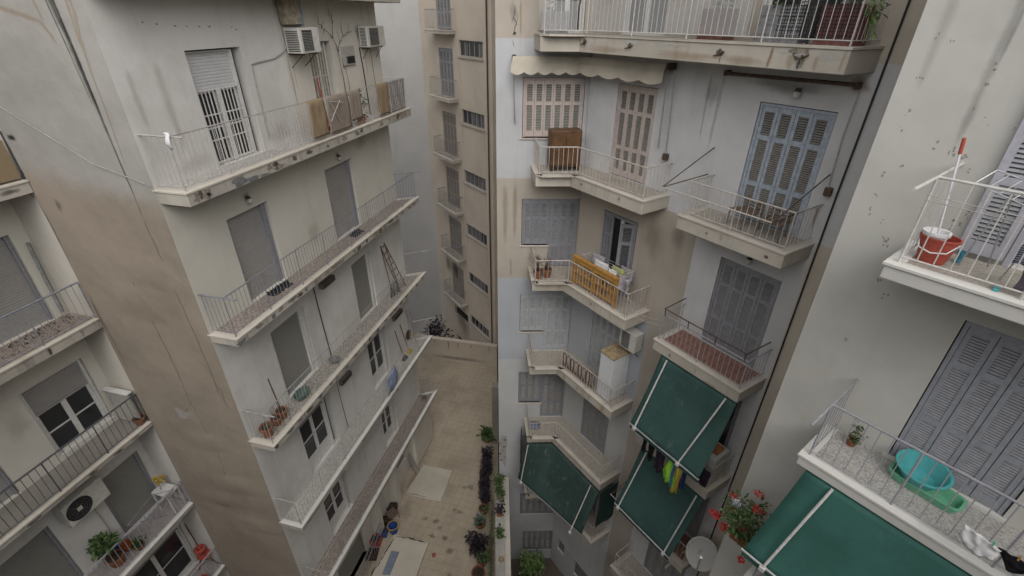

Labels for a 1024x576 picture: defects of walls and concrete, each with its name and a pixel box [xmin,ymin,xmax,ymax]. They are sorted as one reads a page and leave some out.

peeling [231,150,313,188]
spalling [194,189,212,202]